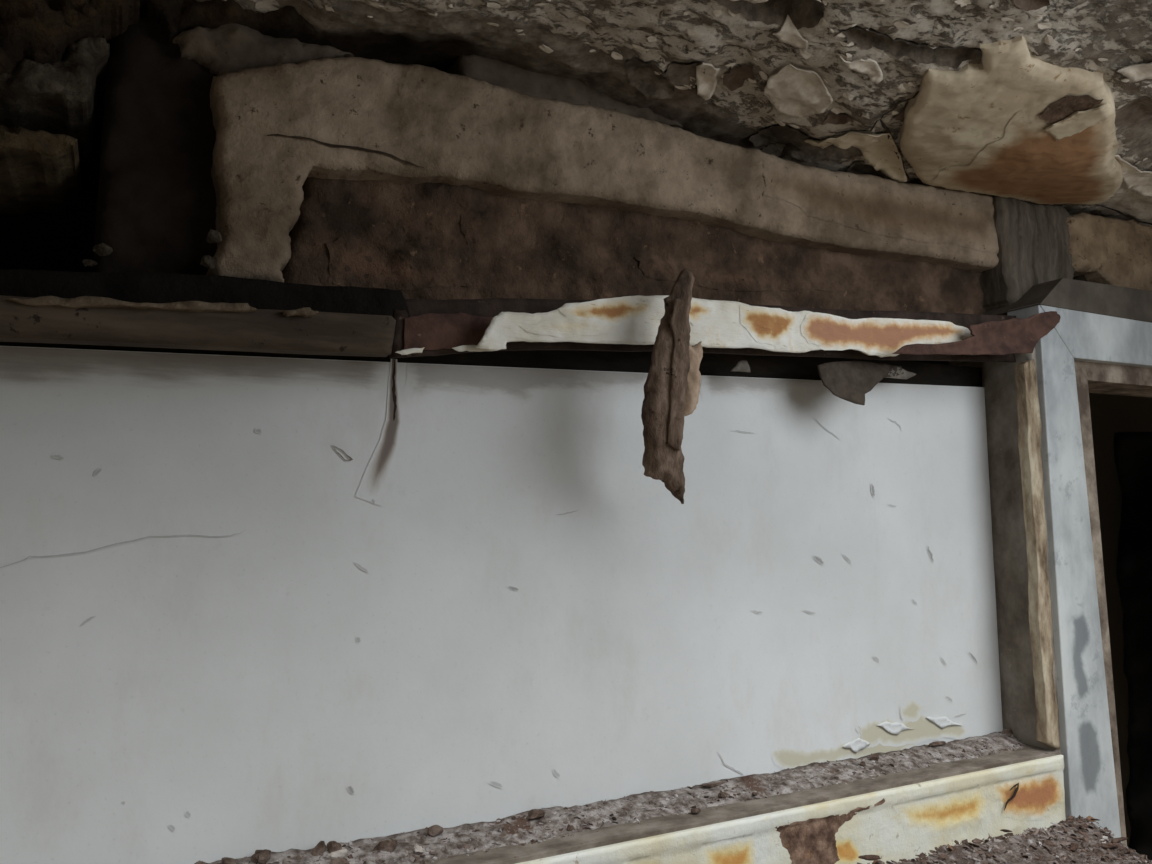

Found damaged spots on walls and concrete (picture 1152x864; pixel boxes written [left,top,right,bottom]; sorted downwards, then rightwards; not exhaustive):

spalling [989,0,1054,45]
peeling [611,0,982,183]
peeling [1118,63,1152,83]
crack [267,134,424,168]
corrosion [932,103,1121,205]
peeling [1115,155,1152,198]
spalling [281,177,986,314]
corrosion [740,305,1061,356]
peeling [817,361,916,405]
crack [0,529,246,568]
peeling [771,699,967,770]
corrosion [775,769,1064,864]